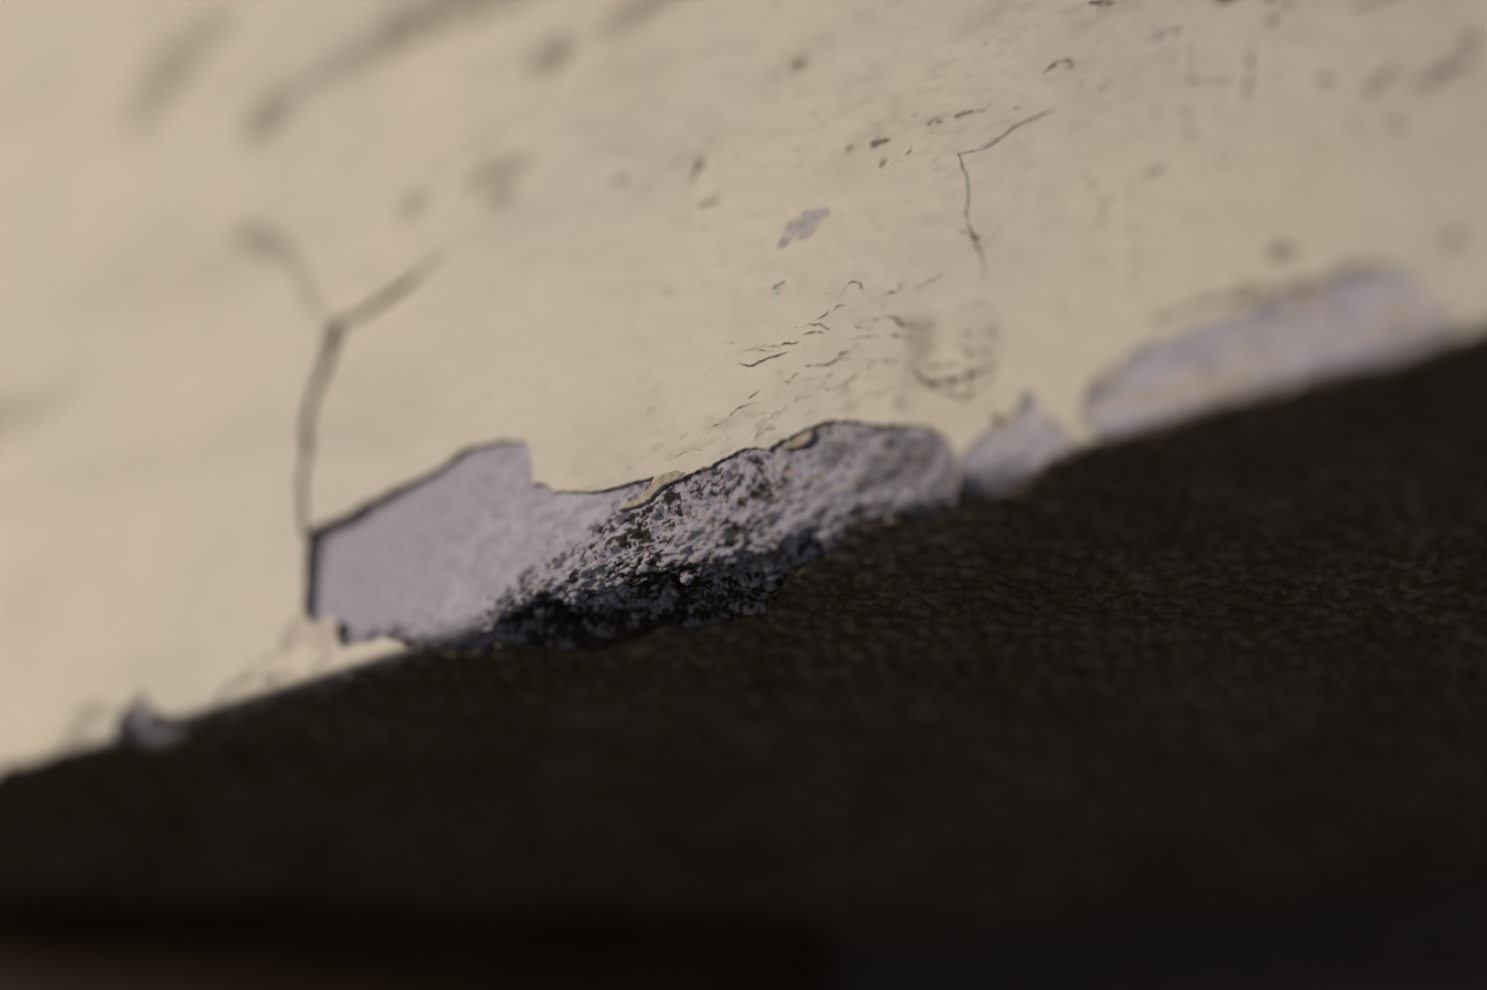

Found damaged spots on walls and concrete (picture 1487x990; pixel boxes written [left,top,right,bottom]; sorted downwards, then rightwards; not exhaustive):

crack [958,110,1053,278]
crack [299,258,436,540]
flaking render [279,271,1455,670]